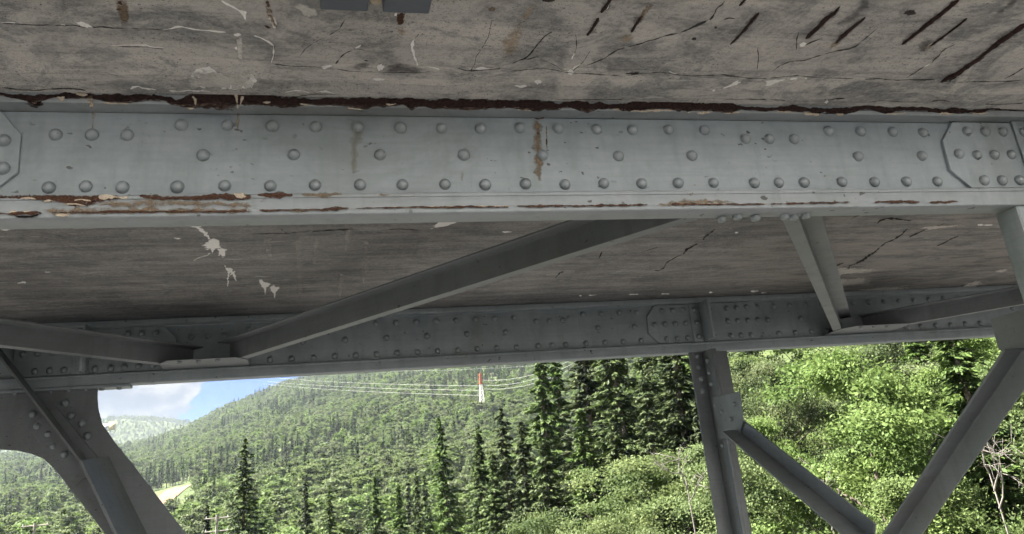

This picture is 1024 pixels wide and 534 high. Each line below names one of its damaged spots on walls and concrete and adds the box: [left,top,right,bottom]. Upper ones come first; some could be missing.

crack [254,1,1023,105]
rust [0,92,1024,180]
rust [0,191,848,218]
crack [643,229,715,271]
crack [837,216,958,268]